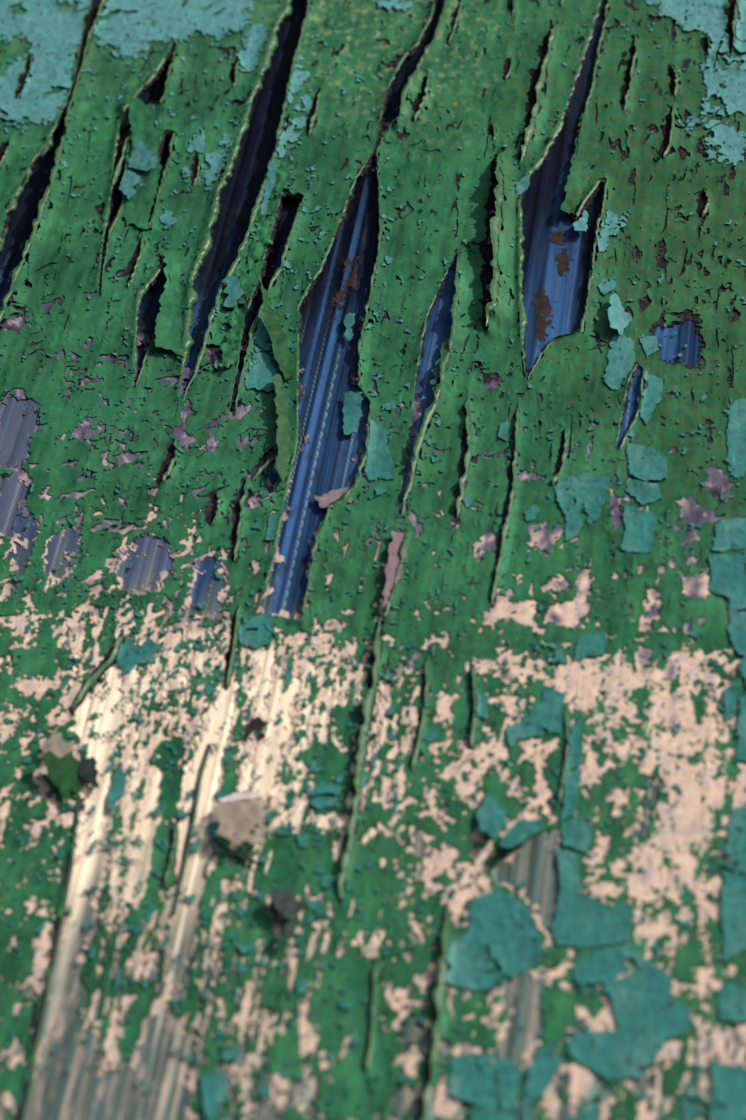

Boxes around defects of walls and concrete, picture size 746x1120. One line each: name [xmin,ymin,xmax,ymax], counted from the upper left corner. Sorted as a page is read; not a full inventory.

peeling [0,0,269,129]
peeling [119,95,177,230]
peeling [261,54,312,215]
peeling [560,112,628,259]
peeling [646,0,746,170]
peeling [0,396,84,595]
peeling [155,250,184,357]
peeling [241,267,294,540]
peeling [342,391,406,496]
peeling [598,276,704,425]
peeling [0,556,362,1120]
peeling [378,397,746,1120]